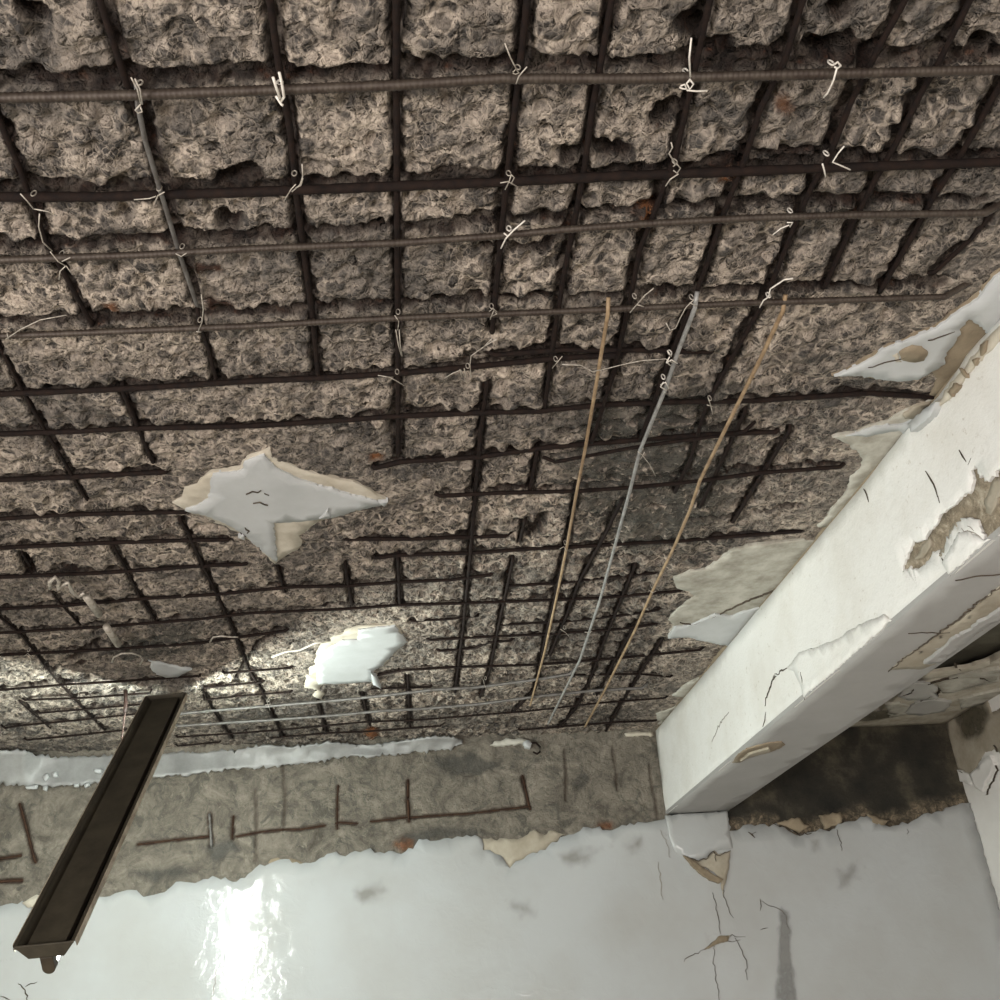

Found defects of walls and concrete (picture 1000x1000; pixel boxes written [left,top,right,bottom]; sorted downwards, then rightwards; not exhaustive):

spalling [0,0,1000,758]
spalling [99,462,677,897]
crack [763,668,805,726]
spalling [728,586,1000,834]
spalling [0,769,103,908]
flaking render [683,850,731,893]
crack [684,892,747,997]
leakage [777,911,795,1000]